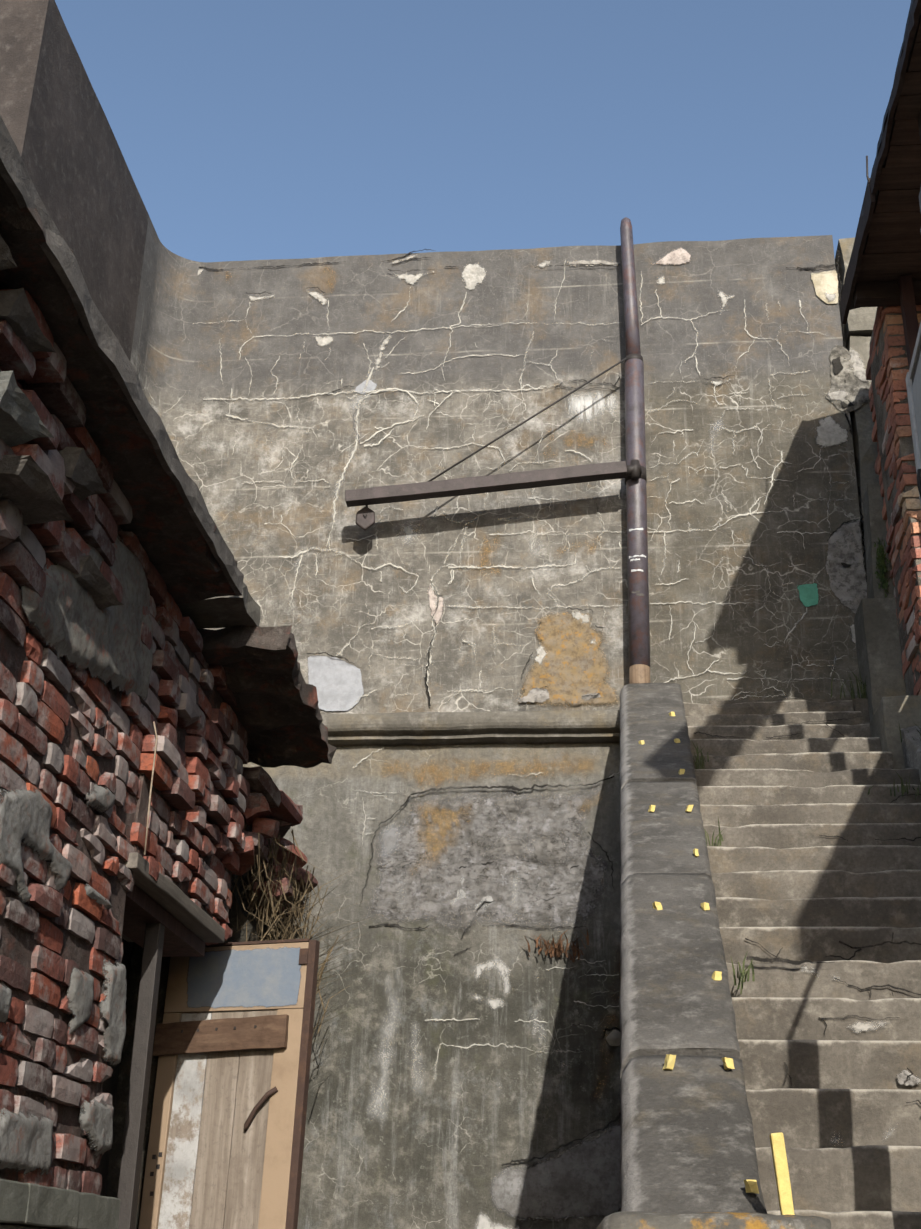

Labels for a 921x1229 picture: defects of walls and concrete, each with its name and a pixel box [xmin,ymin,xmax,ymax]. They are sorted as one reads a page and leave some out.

spalling [388,255,435,284]
spalling [461,264,486,290]
spalling [811,267,839,304]
spalling [315,336,333,346]
spalling [816,345,869,448]
crack [193,249,867,739]
flaking render [21,534,153,707]
spalling [307,652,364,711]
spalling [518,607,618,707]
flaking render [0,788,73,904]
crack [362,792,397,868]
crack [818,934,921,1036]